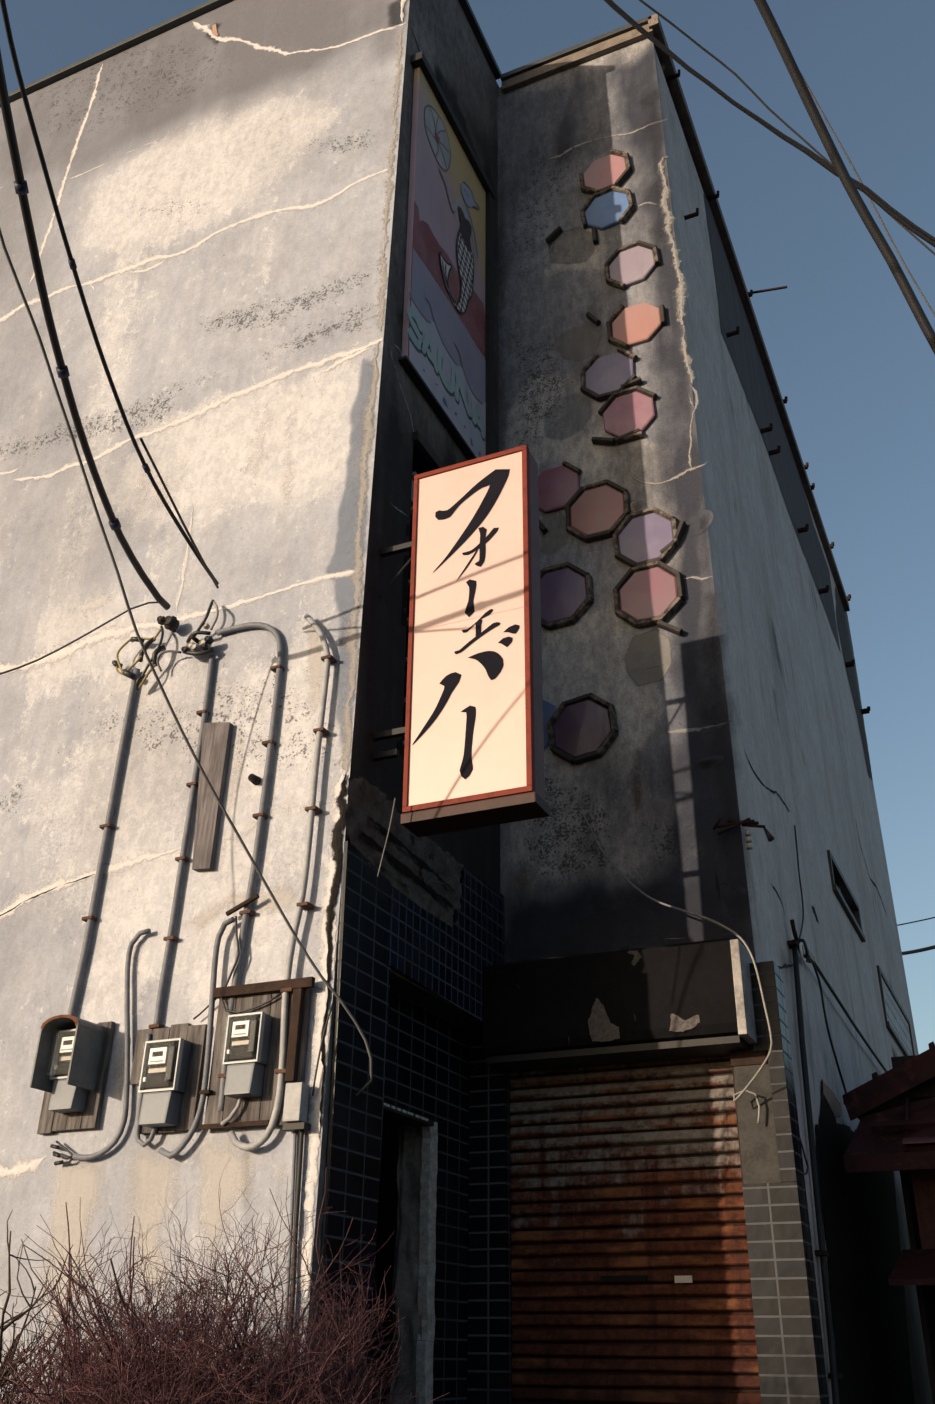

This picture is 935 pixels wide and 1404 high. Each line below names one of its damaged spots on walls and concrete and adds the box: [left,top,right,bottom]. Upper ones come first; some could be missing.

crack [193,22,420,56]
crack [0,64,396,322]
crack [0,338,414,482]
crack [0,504,361,675]
spalling [291,0,464,1299]
damp [506,596,746,963]
crack [0,848,181,919]
peeling [588,998,620,1042]
peeling [669,1013,700,1032]
crack [0,1155,47,1179]